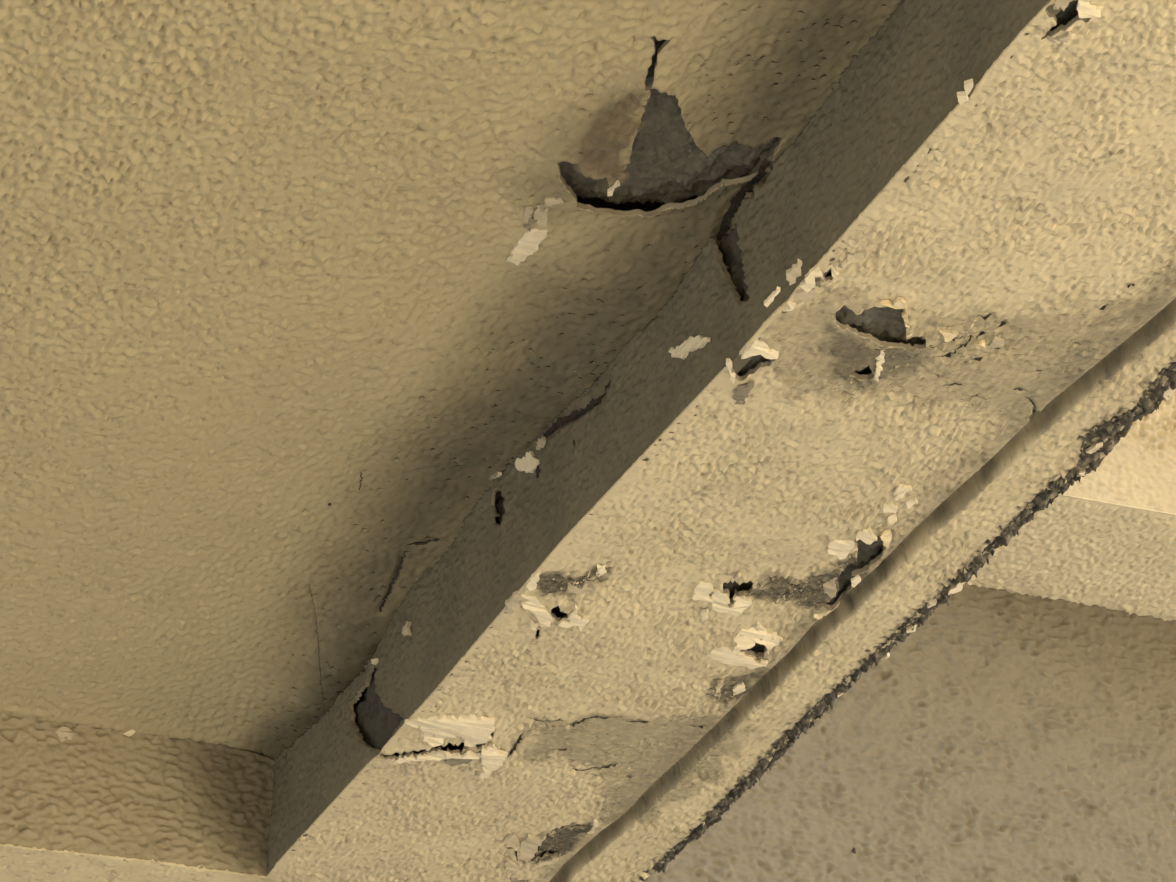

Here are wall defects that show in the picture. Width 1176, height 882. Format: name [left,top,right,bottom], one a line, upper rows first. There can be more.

spalling [1047,0,1104,44]
peeling [506,77,778,265]
crack [716,158,771,302]
spalling [668,335,711,360]
spalling [726,339,779,405]
spalling [834,297,1006,383]
peeling [402,621,412,636]
spalling [505,562,609,633]
spalling [649,362,1176,873]
peeling [355,658,524,782]
peeling [534,716,733,816]
spalling [503,810,606,875]